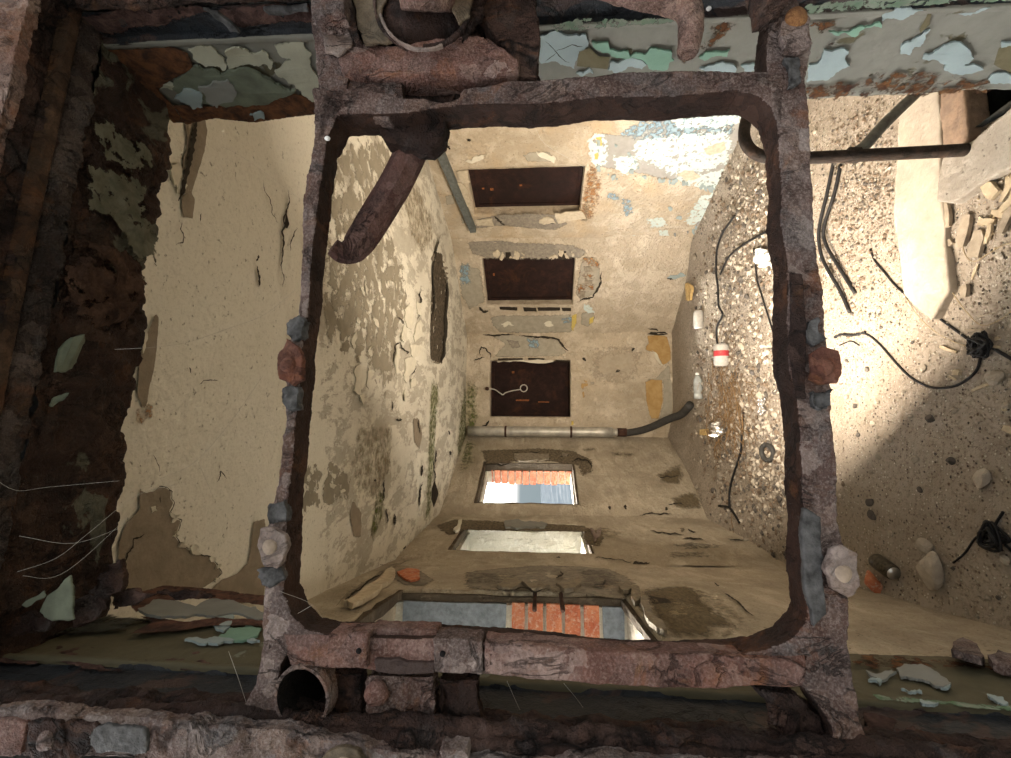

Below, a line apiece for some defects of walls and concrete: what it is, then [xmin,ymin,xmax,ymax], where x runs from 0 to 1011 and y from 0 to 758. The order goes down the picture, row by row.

peeling [160,42,319,121]
corrosion [806,71,990,100]
peeling [804,0,1011,84]
spalling [170,120,207,218]
corrosion [582,167,601,221]
peeling [587,115,741,237]
crack [256,189,296,287]
corrosion [576,257,602,301]
peeling [22,575,75,621]
peeling [119,486,265,646]